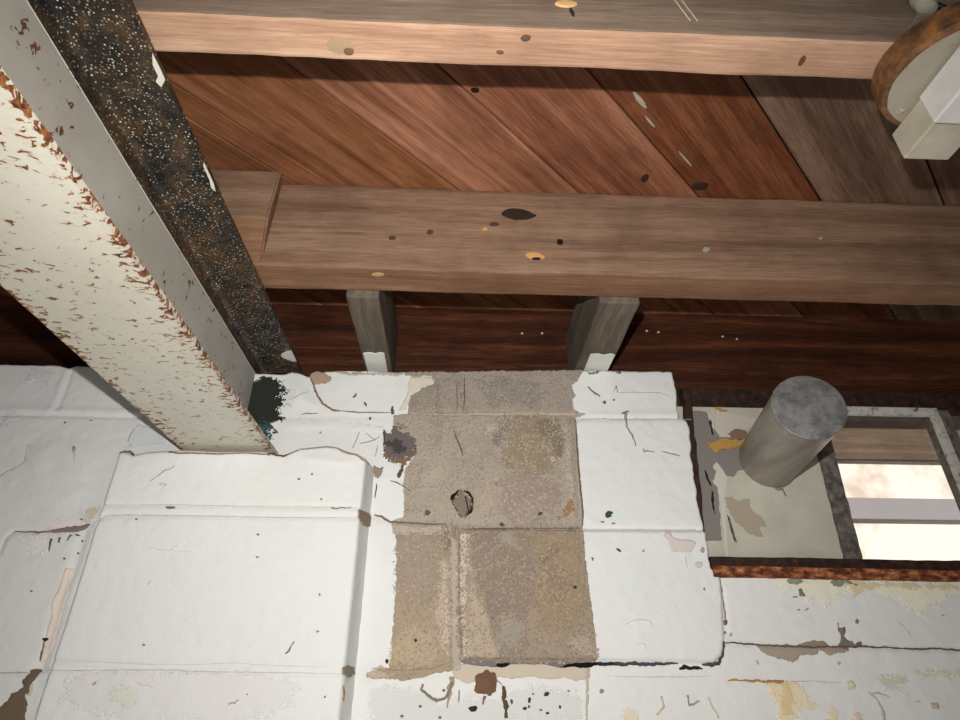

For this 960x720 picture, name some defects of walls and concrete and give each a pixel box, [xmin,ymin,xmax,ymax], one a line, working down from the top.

peeling [0,557,74,720]
peeling [310,370,599,683]
water stain [367,376,600,720]
peeling [787,579,809,611]
peeling [755,619,862,665]